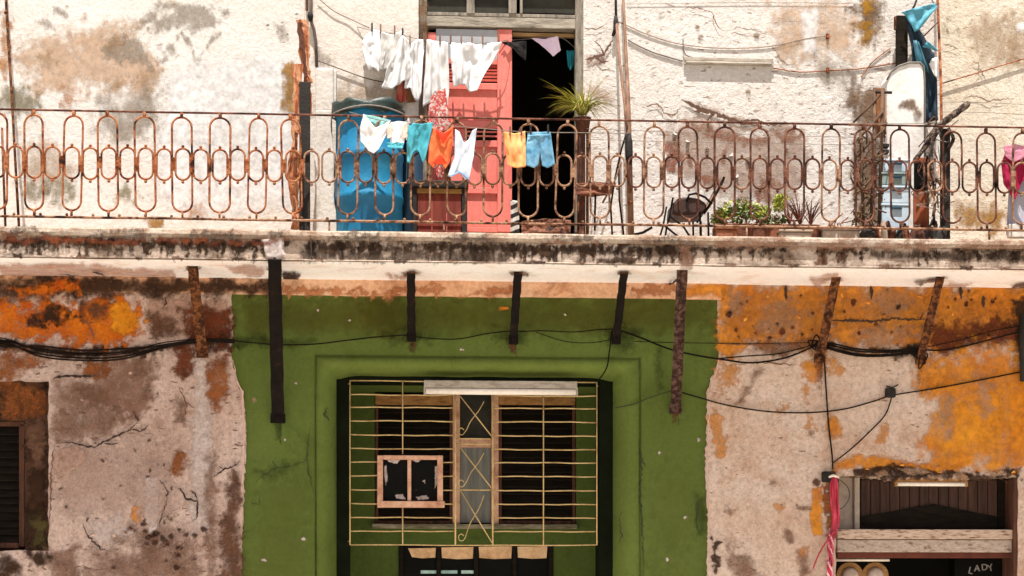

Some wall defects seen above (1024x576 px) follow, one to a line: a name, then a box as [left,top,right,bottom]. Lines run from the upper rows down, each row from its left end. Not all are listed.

damp [102,36,148,63]
damp [140,2,229,62]
damp [301,229,793,267]
damp [816,202,1024,267]
damp [0,225,290,576]
peeling [686,284,1024,574]
crack [48,411,149,532]
crack [159,481,199,559]